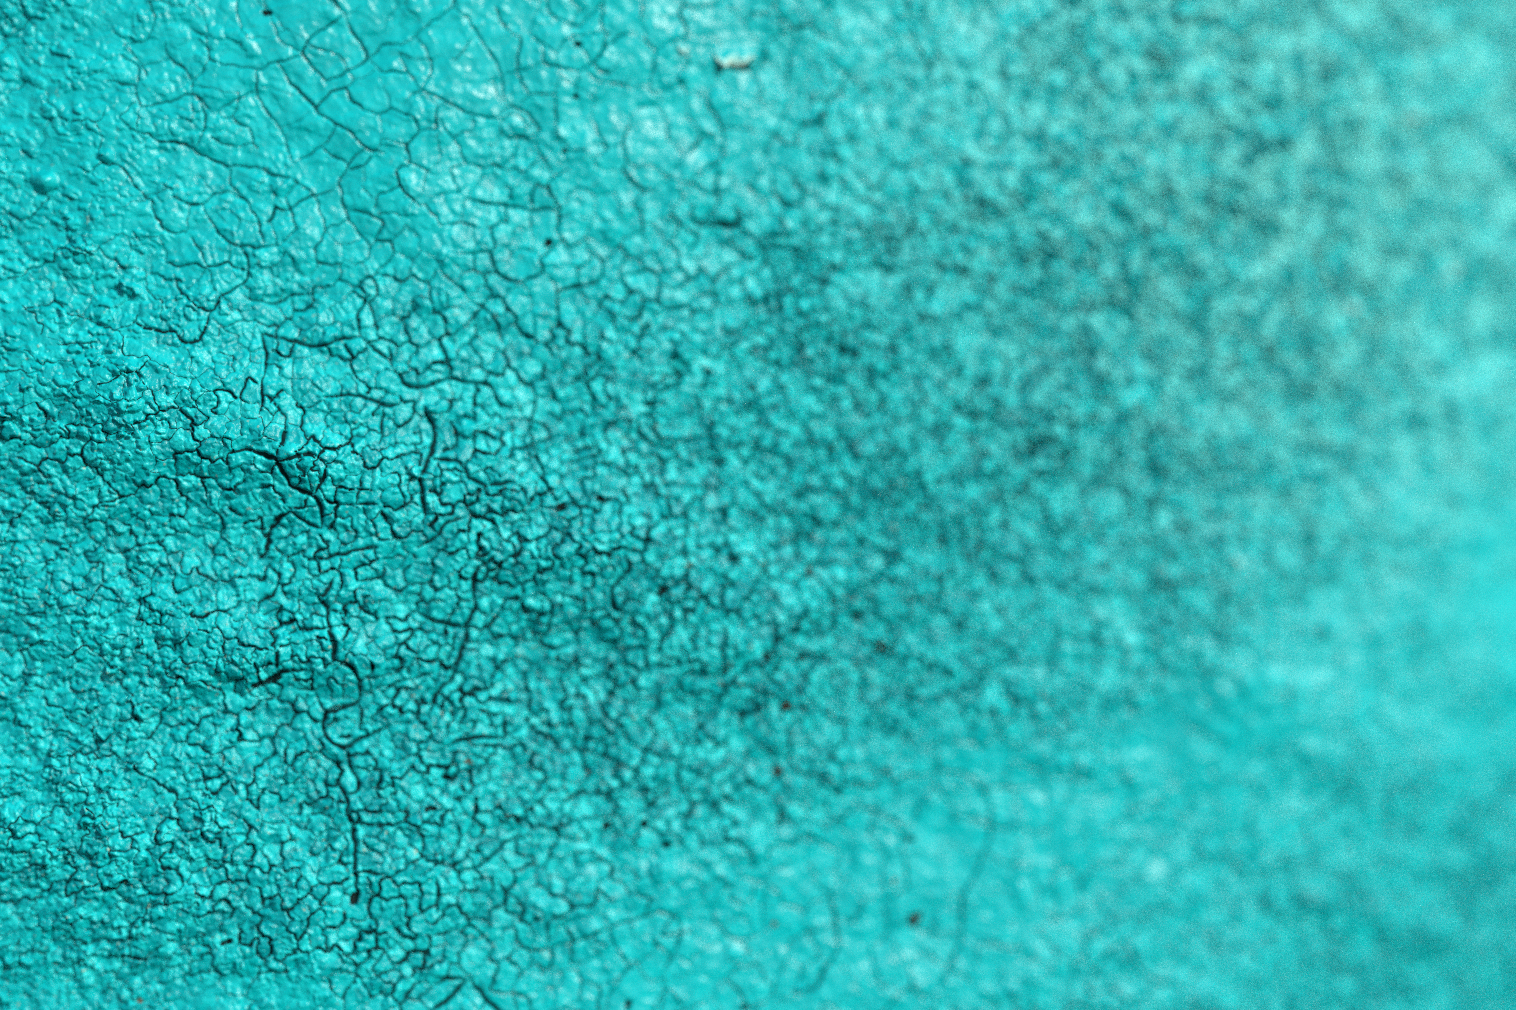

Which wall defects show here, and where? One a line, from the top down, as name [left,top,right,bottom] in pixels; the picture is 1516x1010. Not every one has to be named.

crack [0,3,36,61]
crack [1,70,105,151]
crack [1,187,58,220]
crack [1,349,76,387]
crack [1135,665,1516,1010]